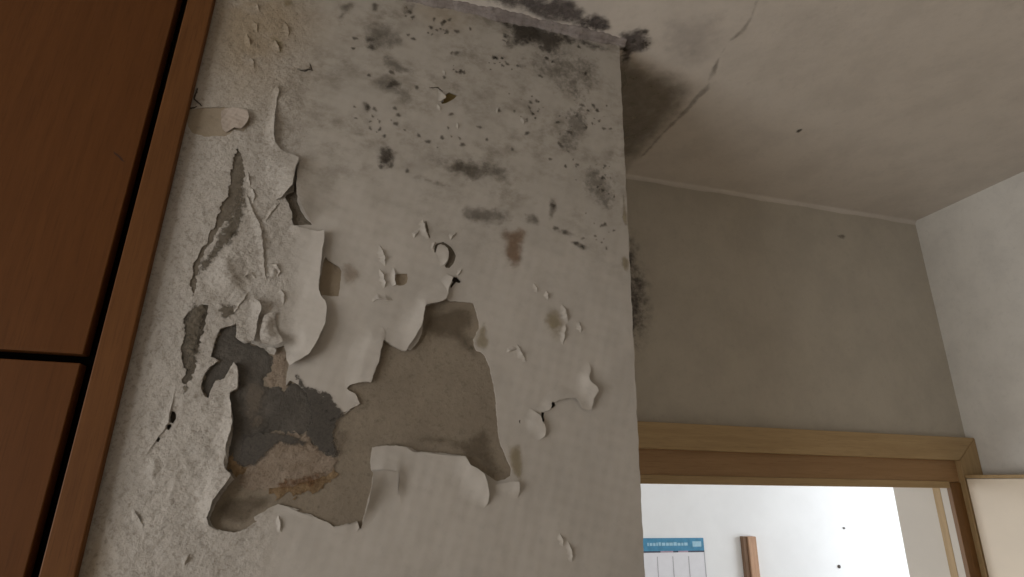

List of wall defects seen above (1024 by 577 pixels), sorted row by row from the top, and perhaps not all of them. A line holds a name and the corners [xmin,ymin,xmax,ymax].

damp [499,0,610,63]
damp [576,30,674,155]
damp [354,105,393,168]
damp [507,233,522,261]
peeling [181,85,520,538]
damp [629,253,642,330]
peeling [519,362,599,440]